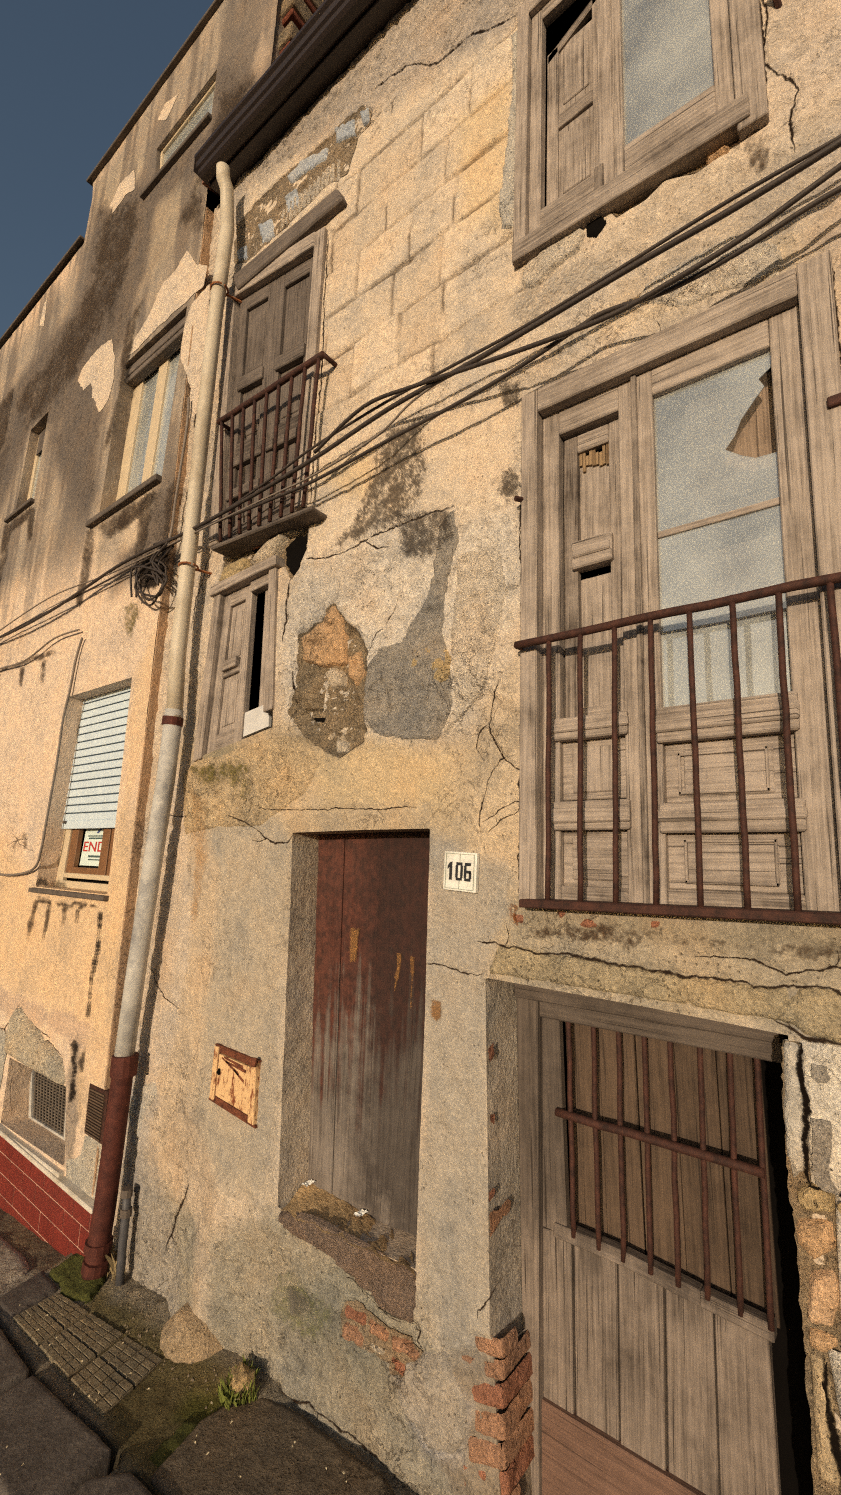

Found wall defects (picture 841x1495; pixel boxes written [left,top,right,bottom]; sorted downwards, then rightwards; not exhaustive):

peeling [110,170,135,213]
flaking render [234,105,372,264]
peeling [78,251,210,419]
crack [832,268,841,362]
leakage [0,508,34,577]
leakage [76,481,176,606]
leakage [399,509,453,559]
crack [516,502,524,606]
spalling [287,603,368,758]
crack [476,680,520,893]
leakage [27,896,101,1017]
crack [428,929,841,1045]